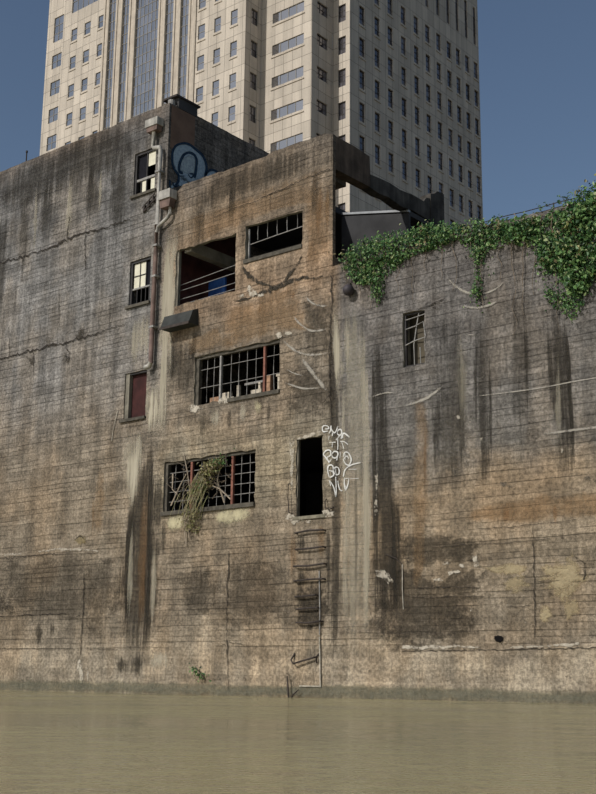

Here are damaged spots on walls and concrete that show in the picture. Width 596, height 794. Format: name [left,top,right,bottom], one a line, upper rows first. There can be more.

crack [0,219,130,306]
spalling [237,256,323,302]
crack [0,306,124,426]
water stain [127,441,139,501]
spalling [402,635,596,652]